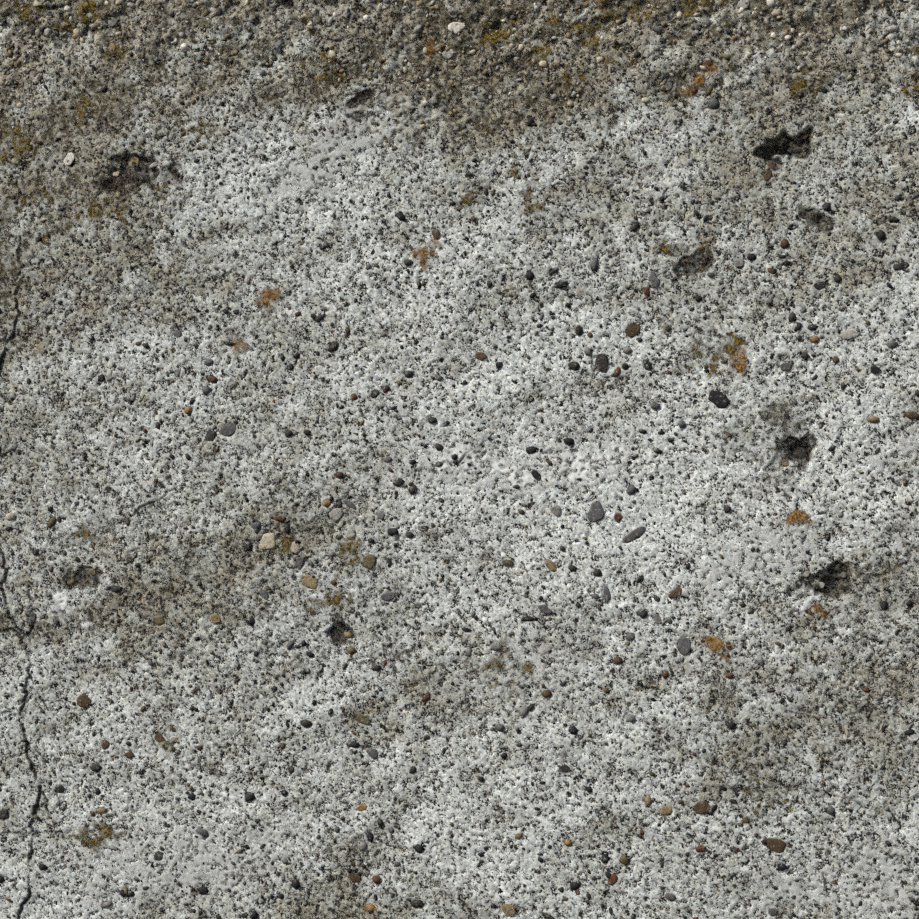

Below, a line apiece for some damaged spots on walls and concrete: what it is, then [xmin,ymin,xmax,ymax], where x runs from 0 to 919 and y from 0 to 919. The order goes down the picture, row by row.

crack [0,237,21,372]
crack [0,549,33,638]
crack [5,669,62,861]
crack [18,888,31,919]